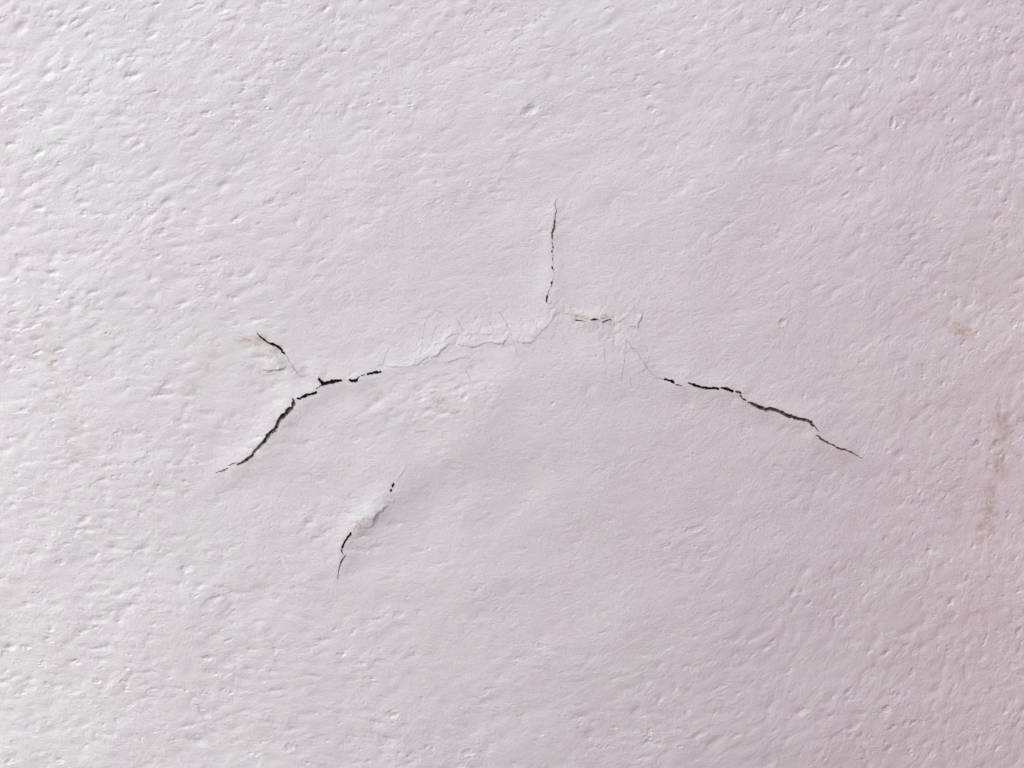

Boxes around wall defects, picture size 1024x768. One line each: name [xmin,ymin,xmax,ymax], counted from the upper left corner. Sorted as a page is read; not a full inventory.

crack [546,199,557,304]
crack [257,333,295,369]
crack [216,371,381,473]
crack [656,377,862,458]